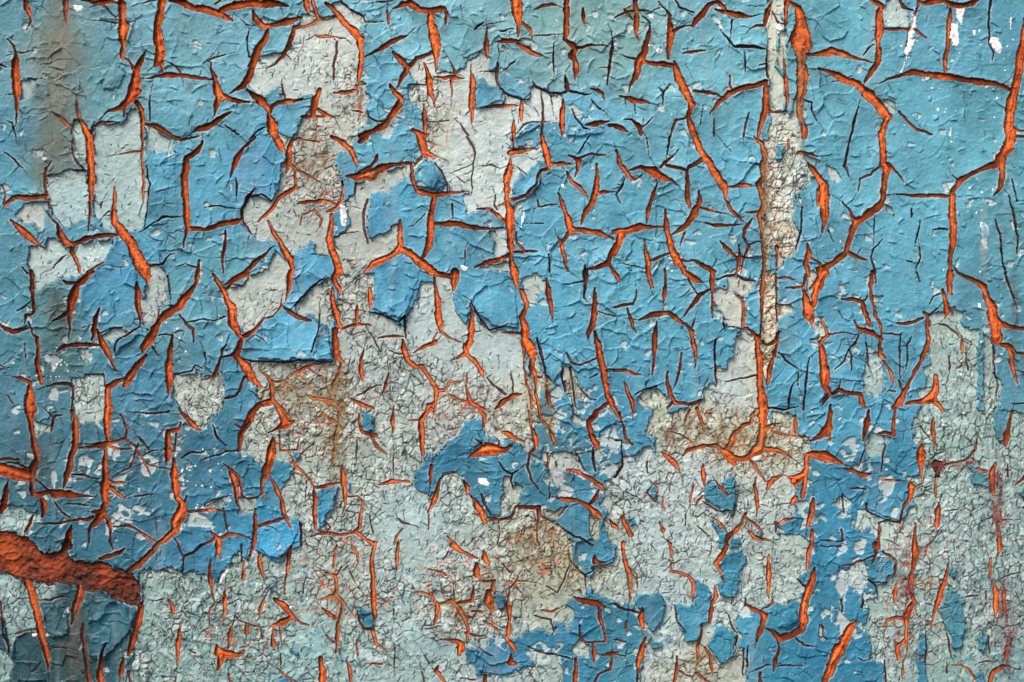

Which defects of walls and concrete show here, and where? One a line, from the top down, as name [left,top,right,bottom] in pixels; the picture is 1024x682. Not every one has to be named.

corrosion [0,531,142,608]
peeling [71,348,106,424]
peeling [15,109,178,293]
crack [0,0,487,627]
peeling [86,0,842,682]
crack [411,536,537,666]
crack [330,0,944,583]
crack [744,497,844,682]
crack [821,599,864,682]
crack [843,417,968,676]
peeling [835,307,1024,682]
crack [884,0,1024,397]